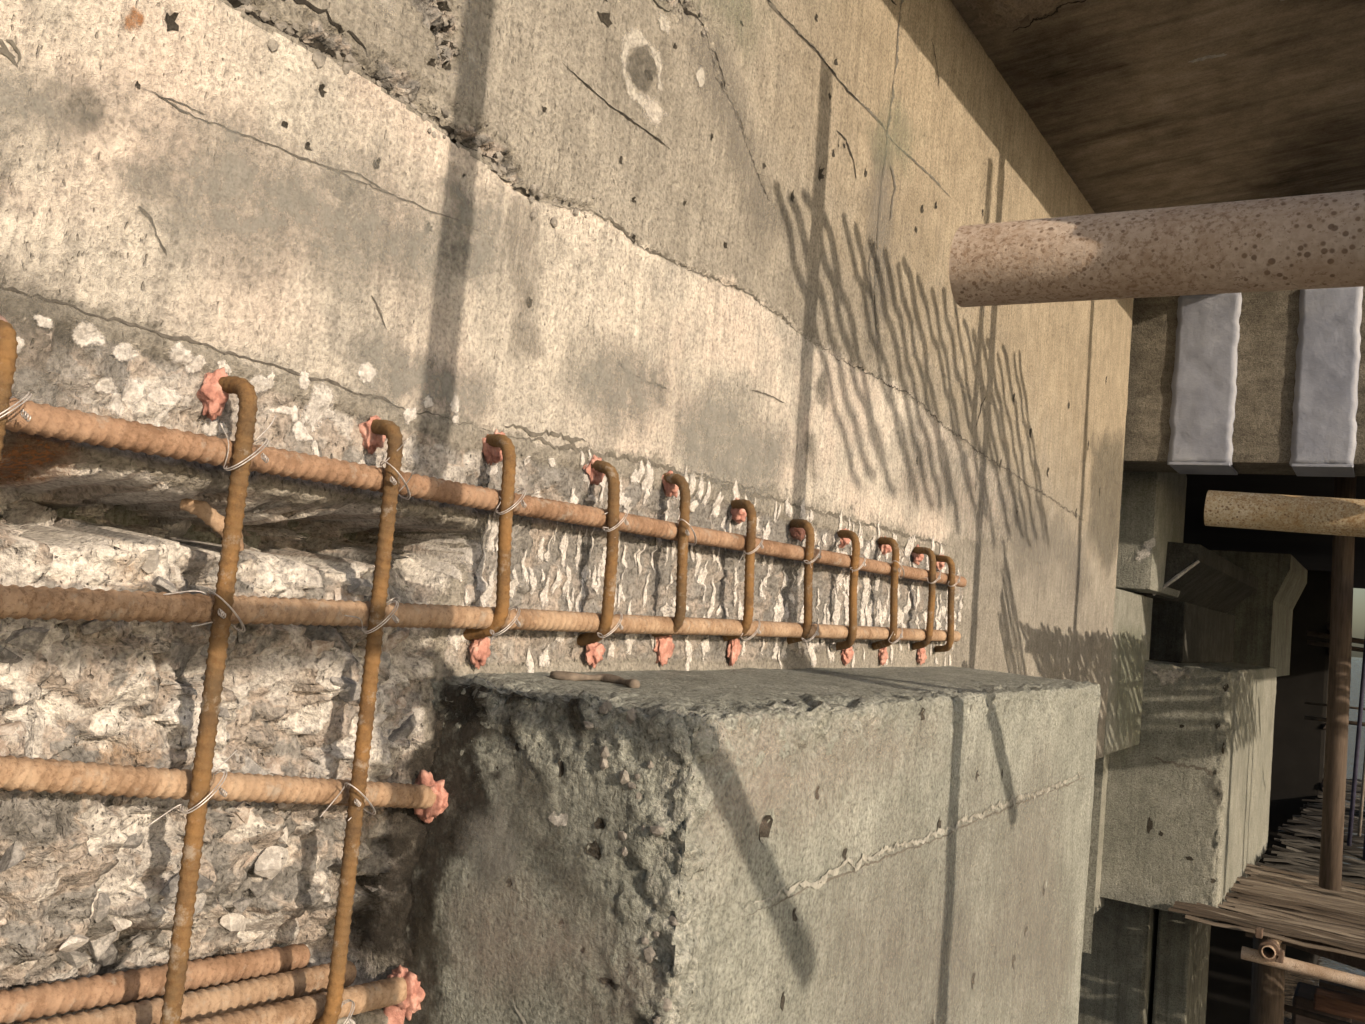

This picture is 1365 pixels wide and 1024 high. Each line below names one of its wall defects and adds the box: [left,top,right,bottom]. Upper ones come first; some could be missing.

crack [139,206,167,255]
crack [136,86,479,231]
crack [562,62,672,151]
crack [654,0,772,203]
crack [768,0,866,108]
spalling [0,441,230,595]
spalling [234,483,498,607]
spalling [0,617,212,771]
spalling [0,788,189,991]
damp [350,668,534,1024]
damp [517,767,568,827]
spalling [188,623,1101,1024]